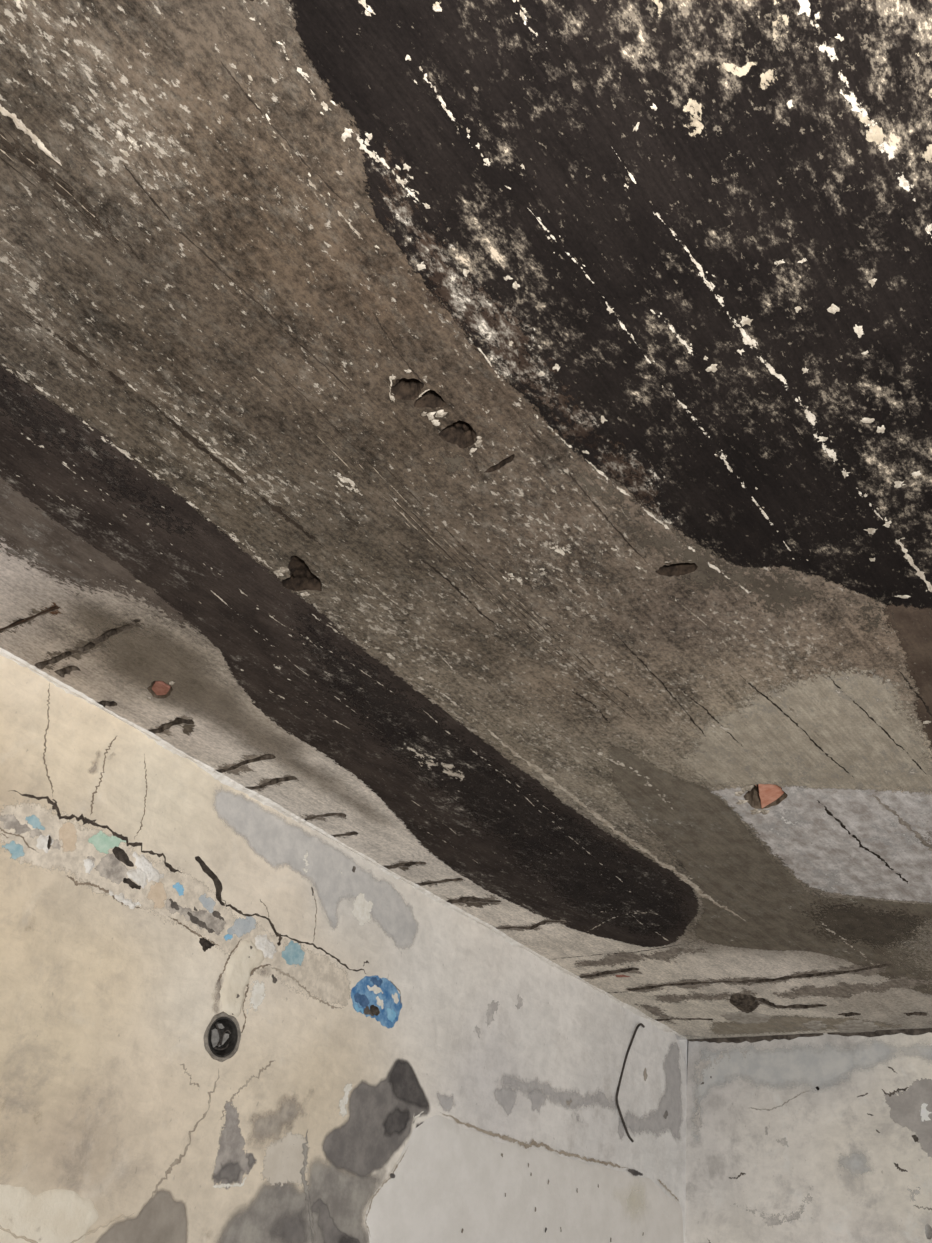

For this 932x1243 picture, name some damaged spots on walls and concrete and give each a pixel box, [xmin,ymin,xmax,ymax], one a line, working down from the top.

spalling [480,454,515,473]
spalling [263,555,322,597]
damp [0,475,329,782]
flaking render [112,846,141,890]
crack [11,683,369,974]
flaking render [214,752,418,949]
flaking render [199,937,215,952]
damp [212,1060,429,1243]
flaking render [884,1078,932,1157]